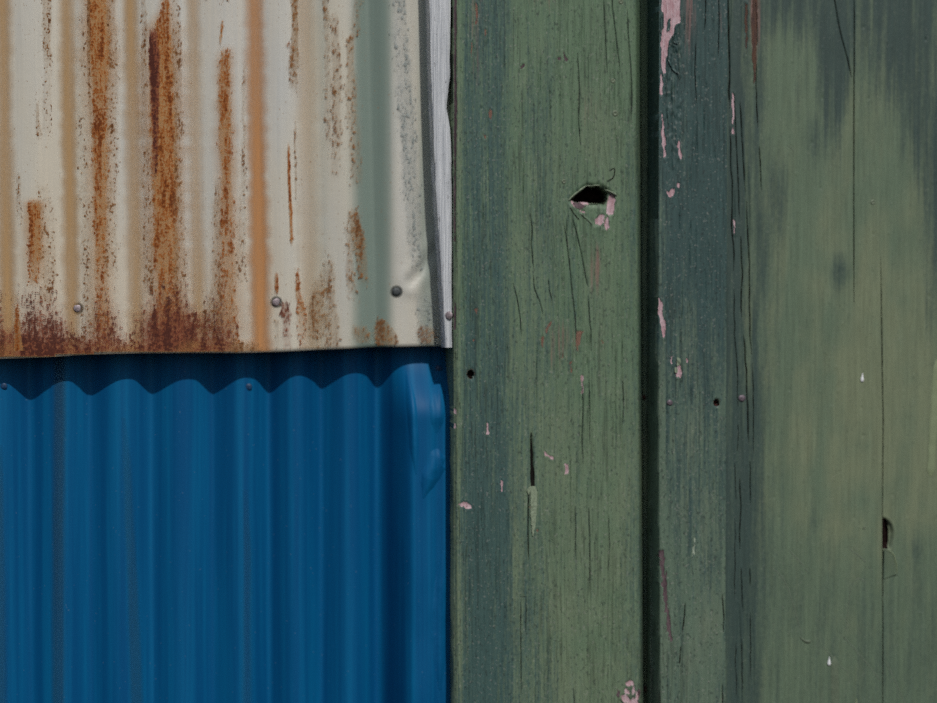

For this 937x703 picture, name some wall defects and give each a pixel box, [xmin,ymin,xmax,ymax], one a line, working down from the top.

rust [287,0,300,92]
peeling [660,0,681,95]
rust [0,0,262,356]
rust [288,131,297,242]
peeling [569,185,616,231]
crack [834,0,855,272]
rust [274,255,342,348]
peeling [658,298,666,338]
crack [878,291,886,423]
crack [527,433,537,558]
crack [879,447,887,702]
peeling [616,680,645,703]